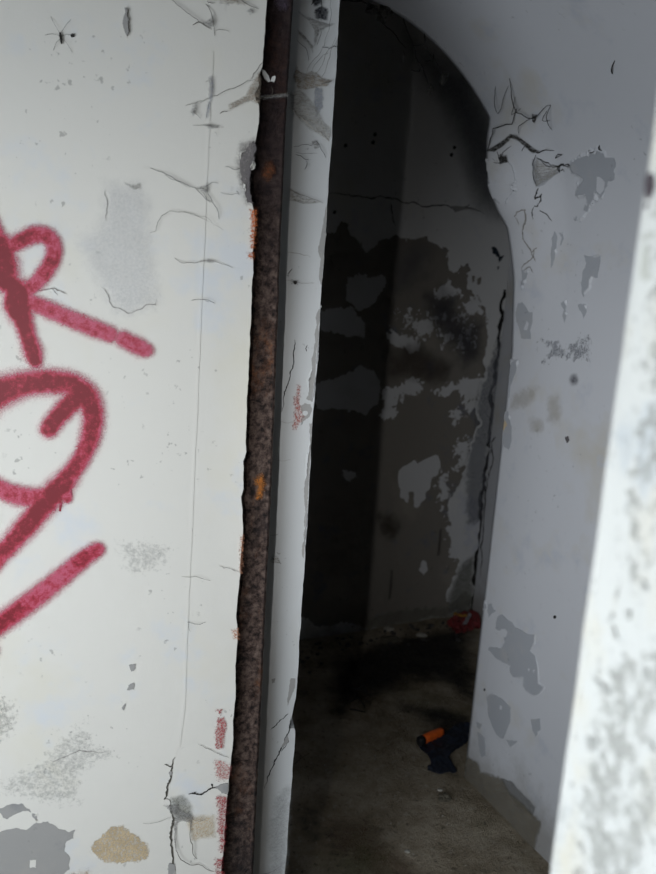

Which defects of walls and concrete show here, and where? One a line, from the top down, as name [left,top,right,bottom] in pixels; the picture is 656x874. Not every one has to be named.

crack [330,193,485,224]
crack [514,189,551,271]
peeling [532,146,616,222]
peeling [299,206,492,630]
crack [471,289,506,611]
peeling [483,600,545,696]
peeling [476,693,518,757]
peeling [0,803,75,874]
peeling [92,826,148,863]
crack [164,759,174,874]
crack [190,783,228,795]